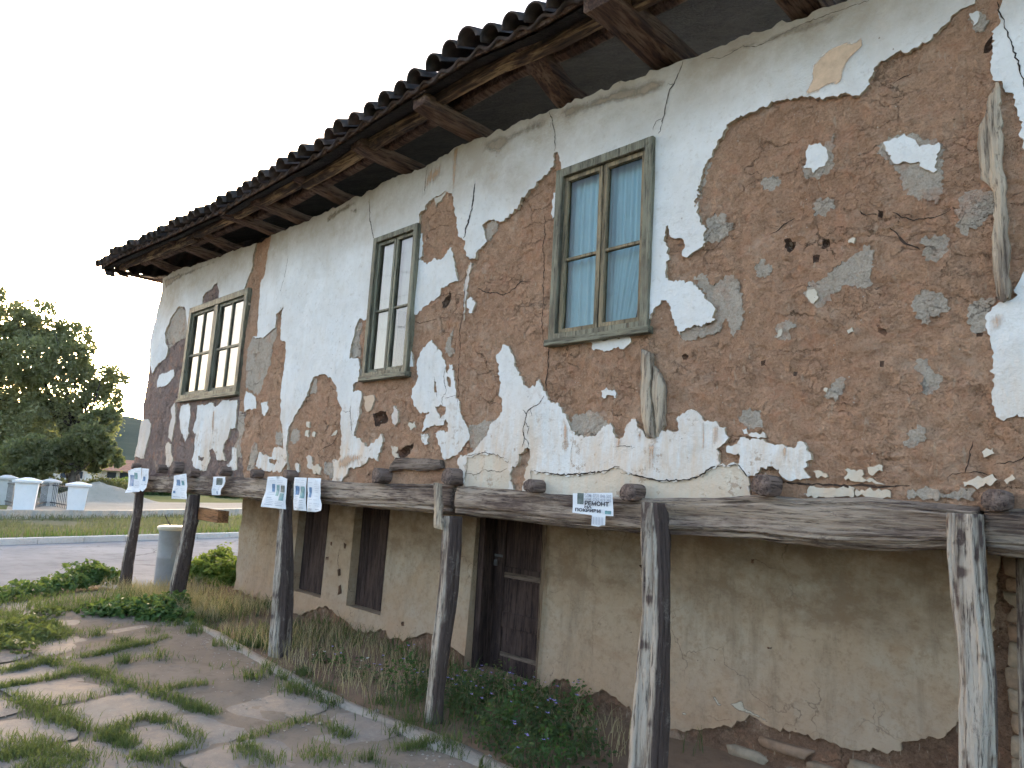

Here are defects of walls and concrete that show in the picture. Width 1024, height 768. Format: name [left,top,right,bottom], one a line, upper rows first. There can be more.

crack [653,0,869,131]
crack [997,2,1024,86]
crack [463,185,475,238]
peeling [134,0,1024,511]
spalling [542,679,632,723]
spalling [669,697,959,768]
spalling [992,556,1019,768]